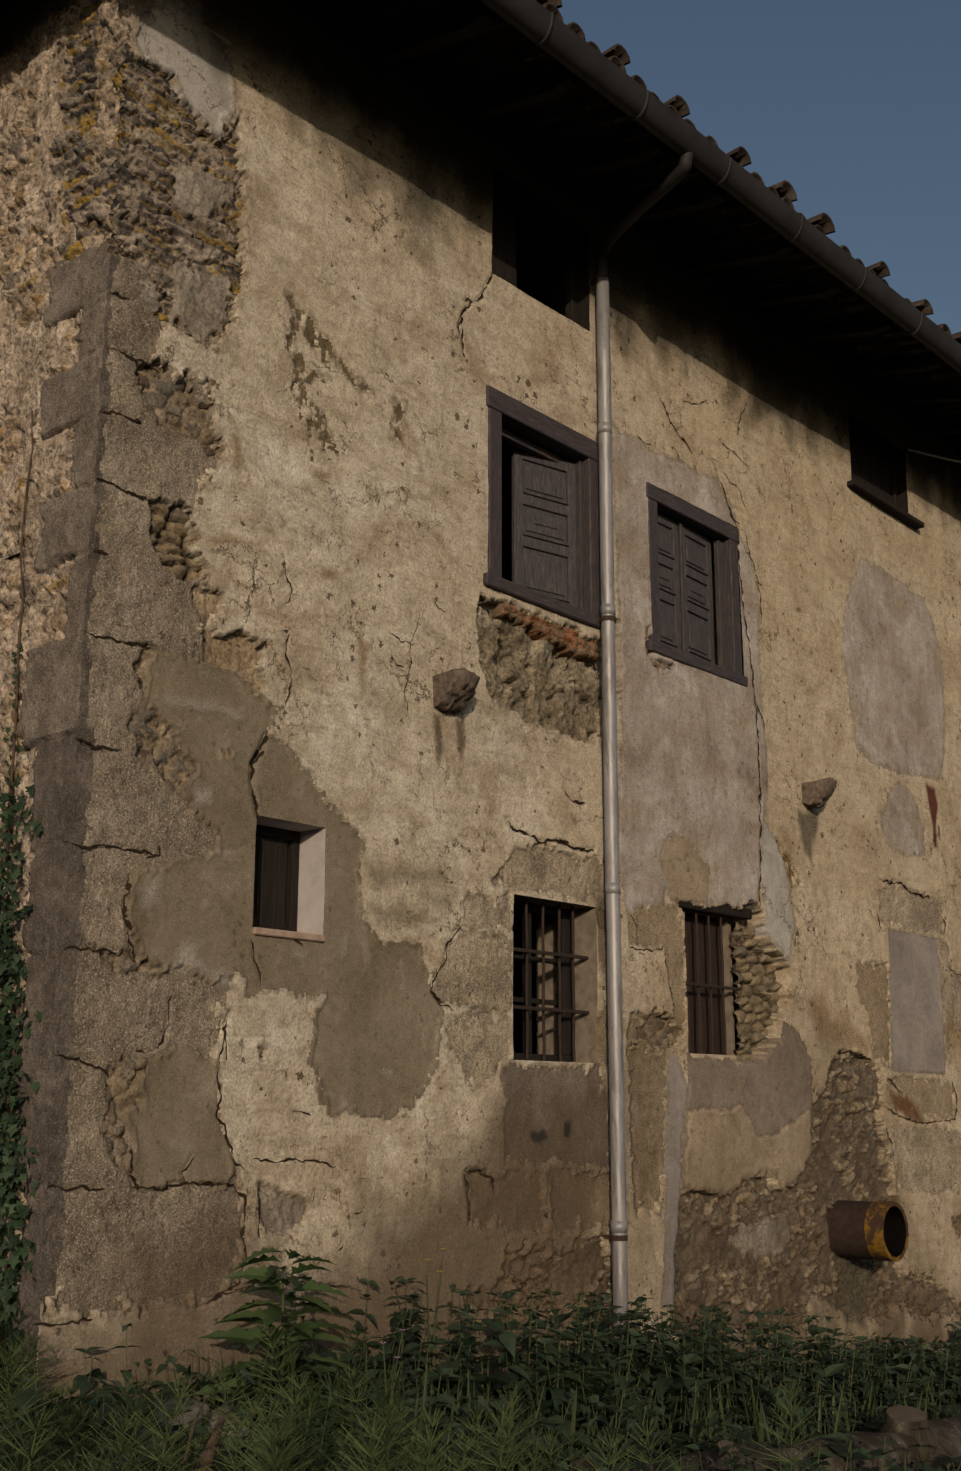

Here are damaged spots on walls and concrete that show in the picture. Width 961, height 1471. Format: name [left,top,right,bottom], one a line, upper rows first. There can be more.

crack [457,273,493,357]
spalling [476,602,602,742]
spalling [56,254,307,1319]
crack [508,821,594,852]
crack [430,927,461,1011]
spalling [951,1217,961,1238]